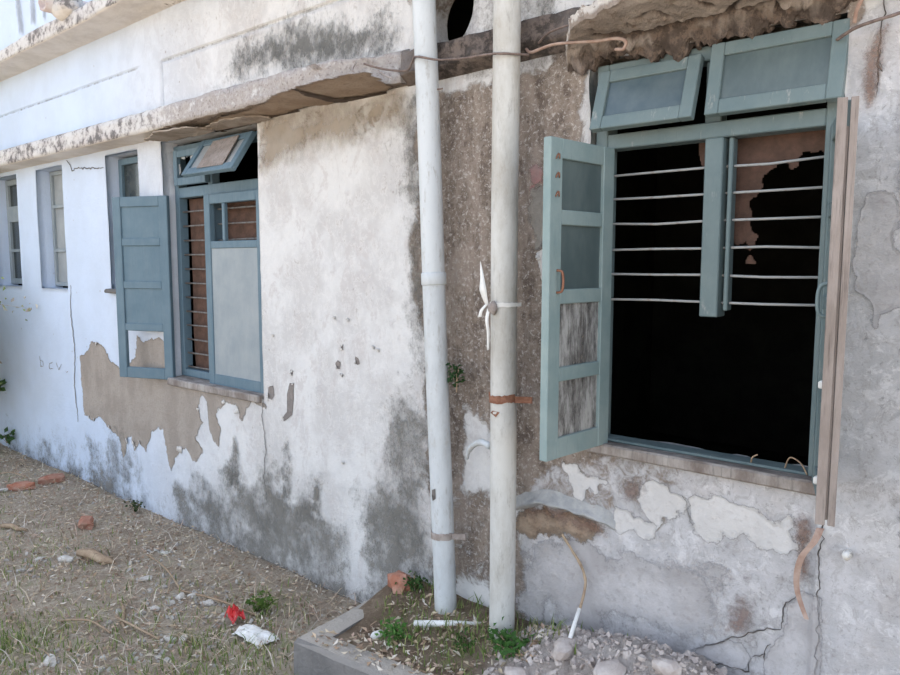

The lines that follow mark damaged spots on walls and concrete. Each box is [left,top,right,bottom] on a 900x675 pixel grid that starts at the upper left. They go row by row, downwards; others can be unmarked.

damp [232,13,394,78]
spalling [525,37,628,54]
spalling [144,72,393,142]
crack [70,285,78,416]
peeling [130,336,165,368]
peeling [80,341,274,471]
peeling [281,370,294,421]
damp [173,400,432,604]
peeling [562,461,608,501]
peeling [614,480,799,555]
rust [797,520,811,574]
crack [673,525,825,674]